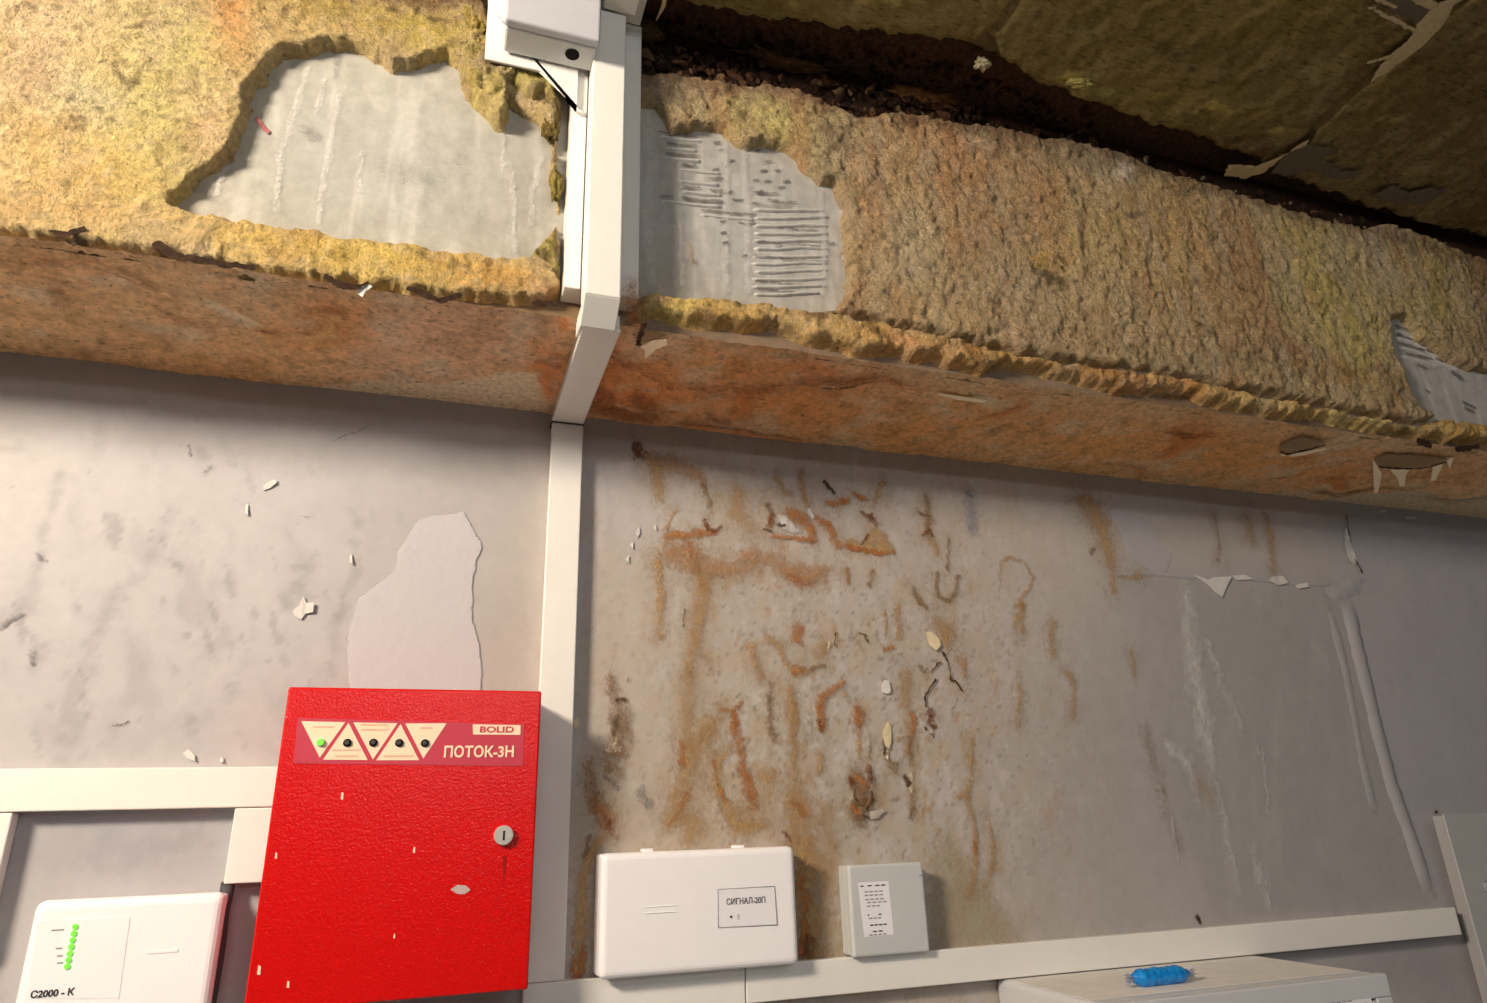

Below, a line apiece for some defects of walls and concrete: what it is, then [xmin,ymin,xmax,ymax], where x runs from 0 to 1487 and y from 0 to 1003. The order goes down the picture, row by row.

peeling [293,597,314,619]
rust [590,356,673,424]
rust [631,441,895,674]
rust [884,495,966,678]
water stain [1183,590,1220,766]
spalling [1279,437,1326,457]
spalling [1373,454,1453,493]
rust [571,761,616,979]
rust [665,624,937,960]
rust [957,740,995,898]